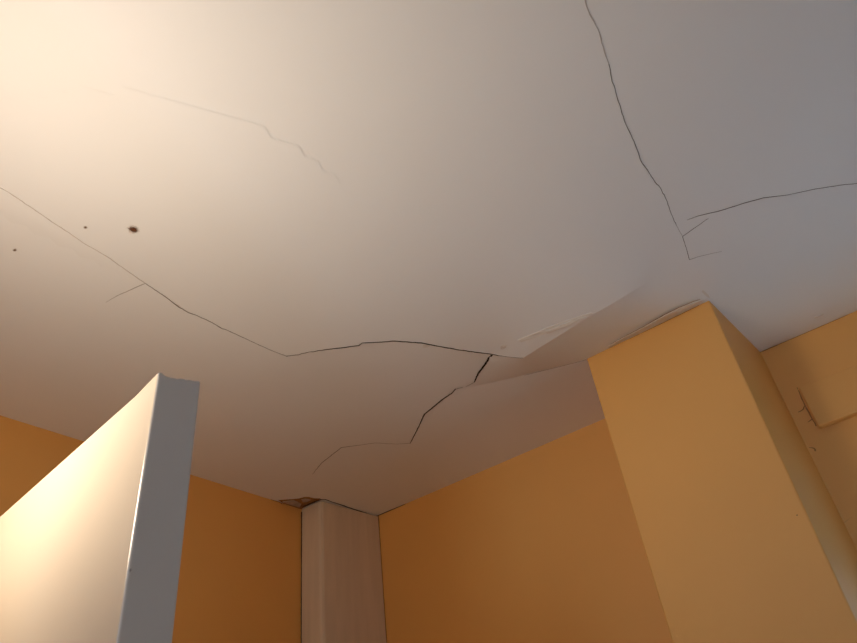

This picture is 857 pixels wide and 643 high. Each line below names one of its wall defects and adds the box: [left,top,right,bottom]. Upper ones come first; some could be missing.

crack [585,0,857,260]
crack [1,188,584,472]